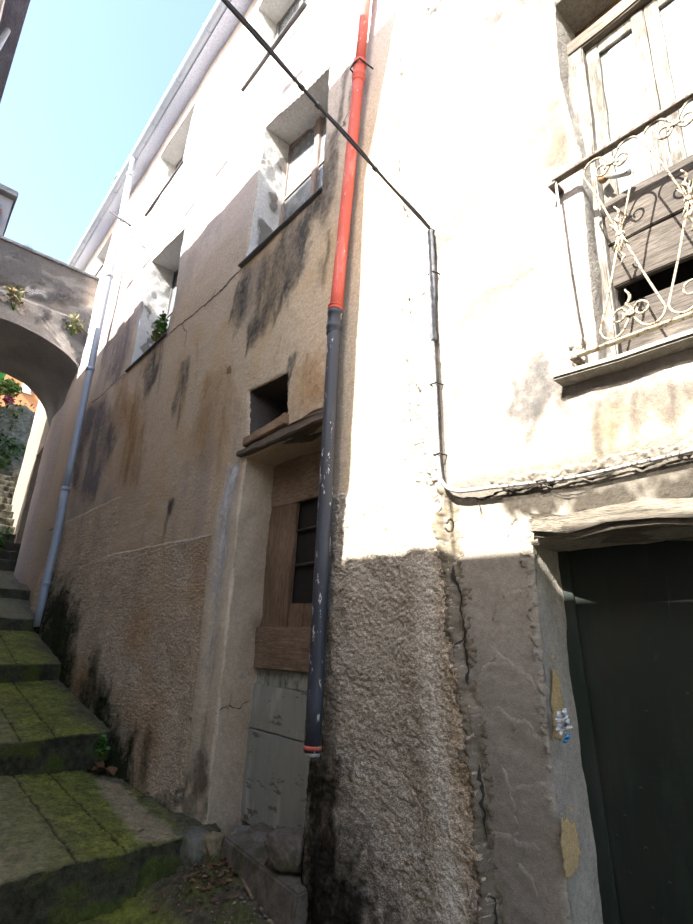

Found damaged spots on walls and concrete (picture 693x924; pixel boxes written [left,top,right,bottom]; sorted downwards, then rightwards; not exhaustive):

spalling [394,0,443,222]
damp [236,131,338,343]
crack [168,267,243,347]
damp [73,401,115,495]
crack [451,566,470,685]
damp [35,588,137,784]
damp [301,742,389,924]
crack [476,765,491,840]
crack [488,895,499,924]